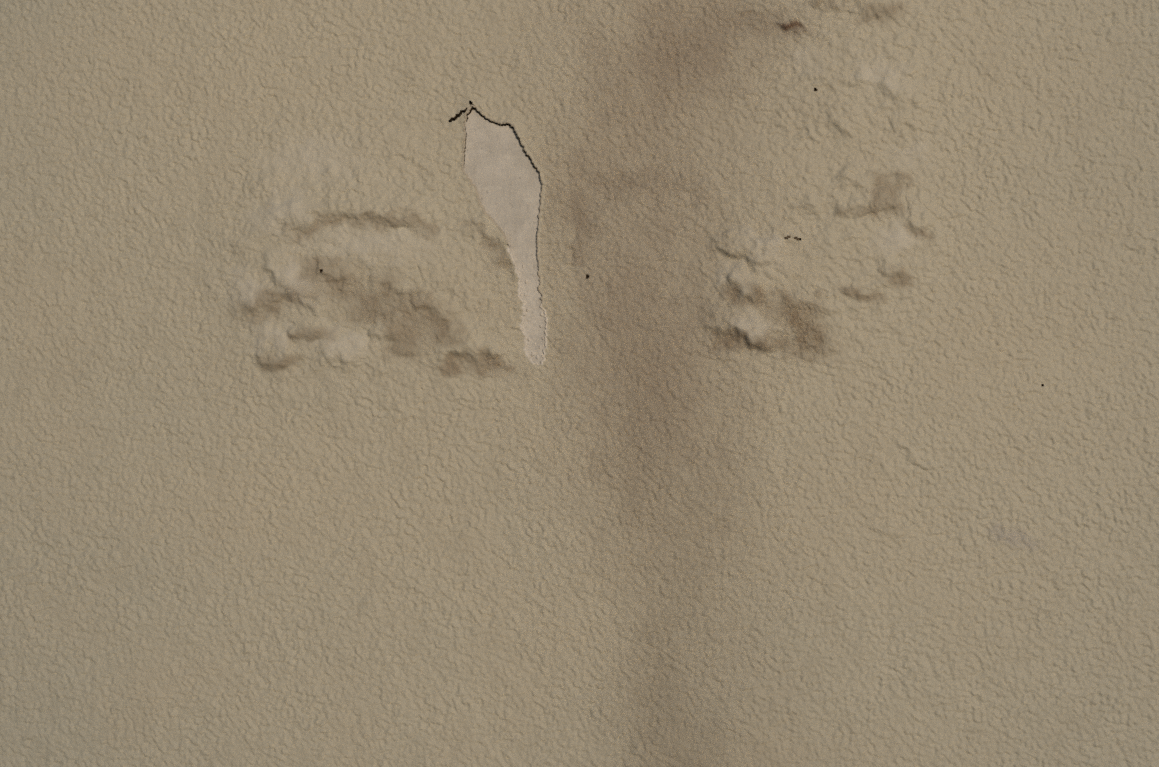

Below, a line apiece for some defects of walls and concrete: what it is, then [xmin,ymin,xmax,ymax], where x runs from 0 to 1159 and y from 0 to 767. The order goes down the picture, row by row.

peeling [461,105,548,366]